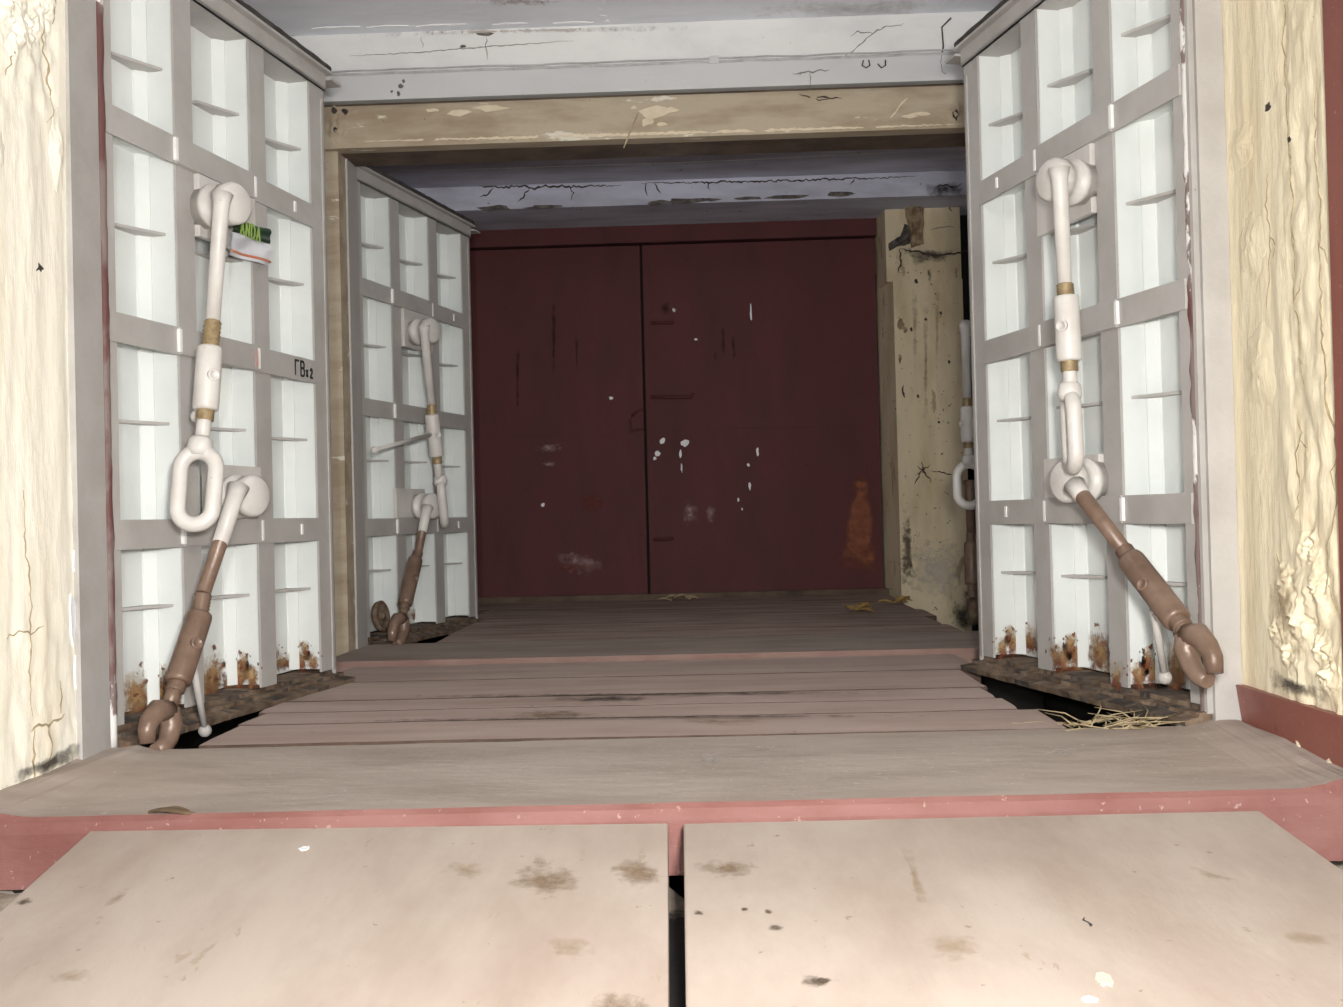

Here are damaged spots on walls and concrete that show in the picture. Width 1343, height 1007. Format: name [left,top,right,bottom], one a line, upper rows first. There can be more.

crack [5,0,56,123]
peeling [426,105,509,117]
peeling [631,105,679,127]
crack [353,23,967,273]
flaking render [947,102,965,125]
crack [1265,0,1338,613]
crack [915,462,952,483]
corrosion [843,480,875,568]
crack [7,490,65,778]
corrosion [124,662,181,713]
corrosion [204,642,322,695]
corrosion [992,622,1185,693]